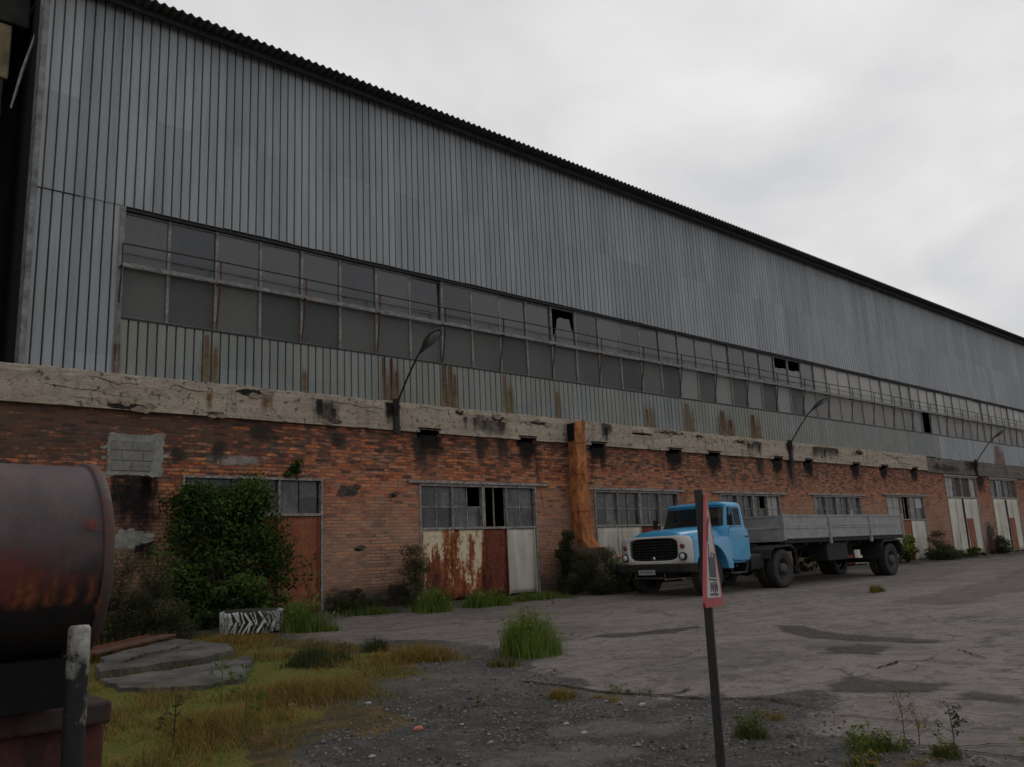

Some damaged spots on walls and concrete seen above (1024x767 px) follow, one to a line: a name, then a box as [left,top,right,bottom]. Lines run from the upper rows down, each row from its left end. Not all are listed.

crack [46,376,142,406]
damp [316,399,336,419]
damp [111,476,158,510]
spalling [338,484,361,497]